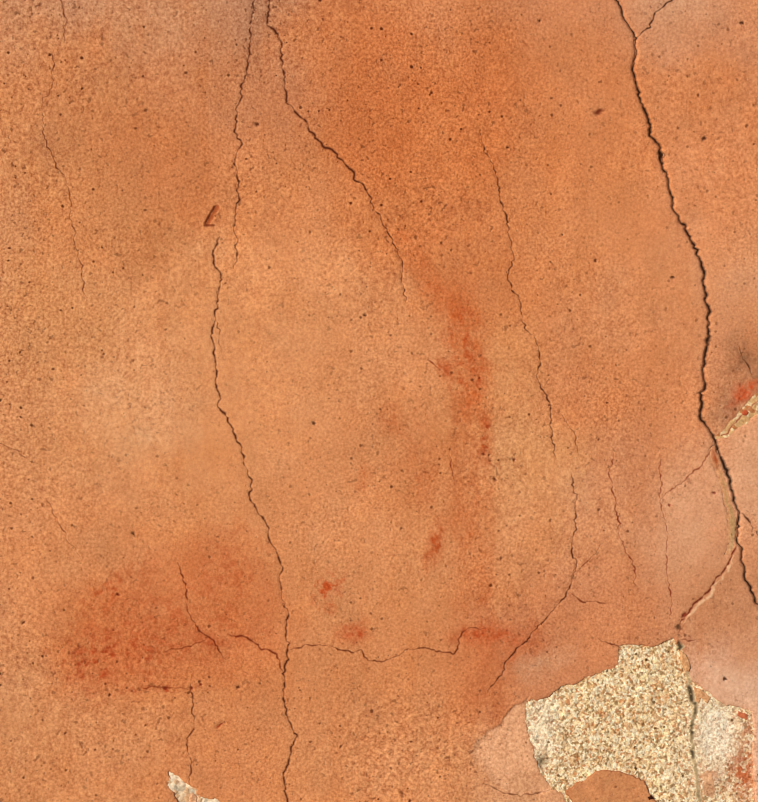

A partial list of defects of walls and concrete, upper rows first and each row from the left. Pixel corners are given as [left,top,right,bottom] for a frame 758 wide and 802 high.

crack [163,0,486,802]
crack [479,128,578,459]
crack [615,0,758,802]
crack [486,452,637,695]
spalling [167,771,219,802]
crack [483,783,554,797]
spalling [468,611,755,802]